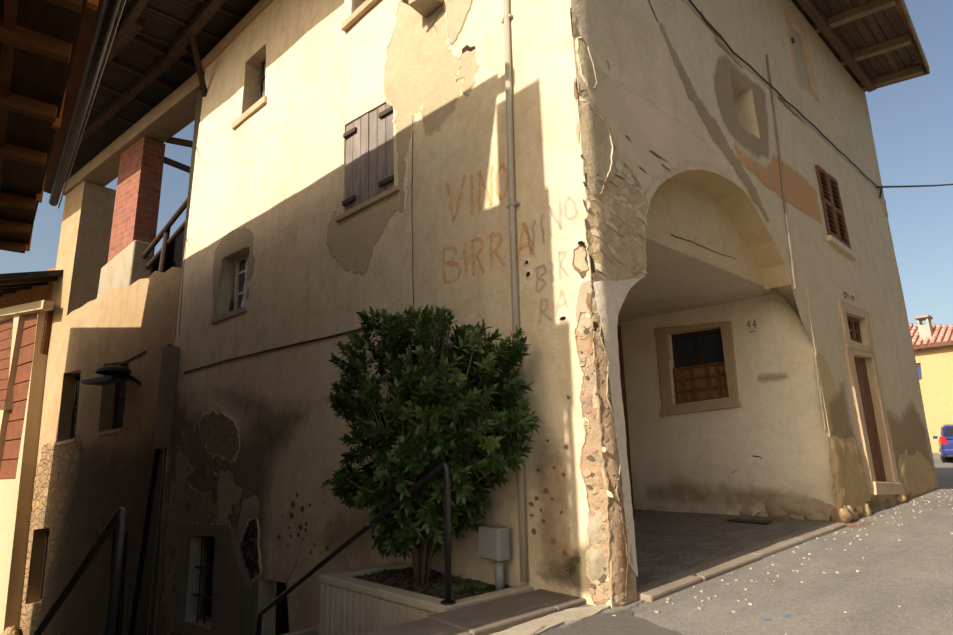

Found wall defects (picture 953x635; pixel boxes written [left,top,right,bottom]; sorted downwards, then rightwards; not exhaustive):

flaking render [326,0,480,275]
flaking render [558,16,650,606]
flaking render [198,410,241,463]
leakage [831,389,853,440]
leakage [886,407,932,464]
leakage [31,398,299,635]
spalling [238,517,263,584]